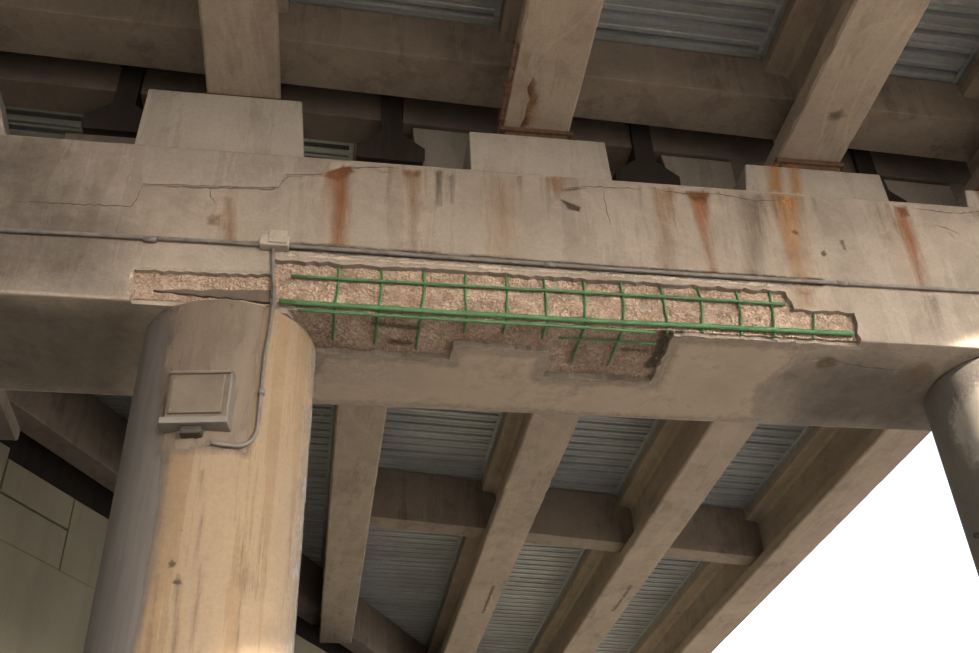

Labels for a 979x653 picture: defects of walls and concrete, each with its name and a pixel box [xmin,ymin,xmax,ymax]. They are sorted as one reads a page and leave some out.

rust [520,82,536,128]
crack [14,166,393,207]
rust [326,167,352,244]
rust [688,192,706,228]
rust [898,208,920,278]
spalling [132,264,858,378]